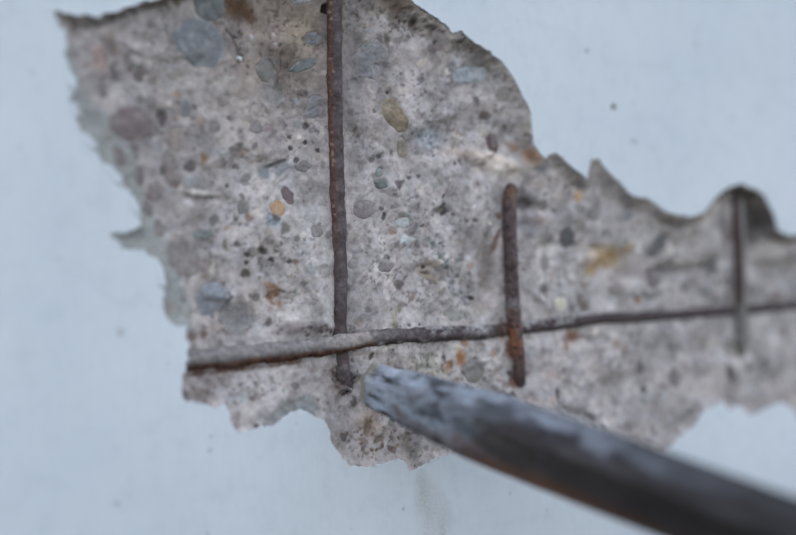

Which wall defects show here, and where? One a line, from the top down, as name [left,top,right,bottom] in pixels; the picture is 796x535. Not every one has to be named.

spalling [55,0,796,388]
spalling [181,301,796,471]